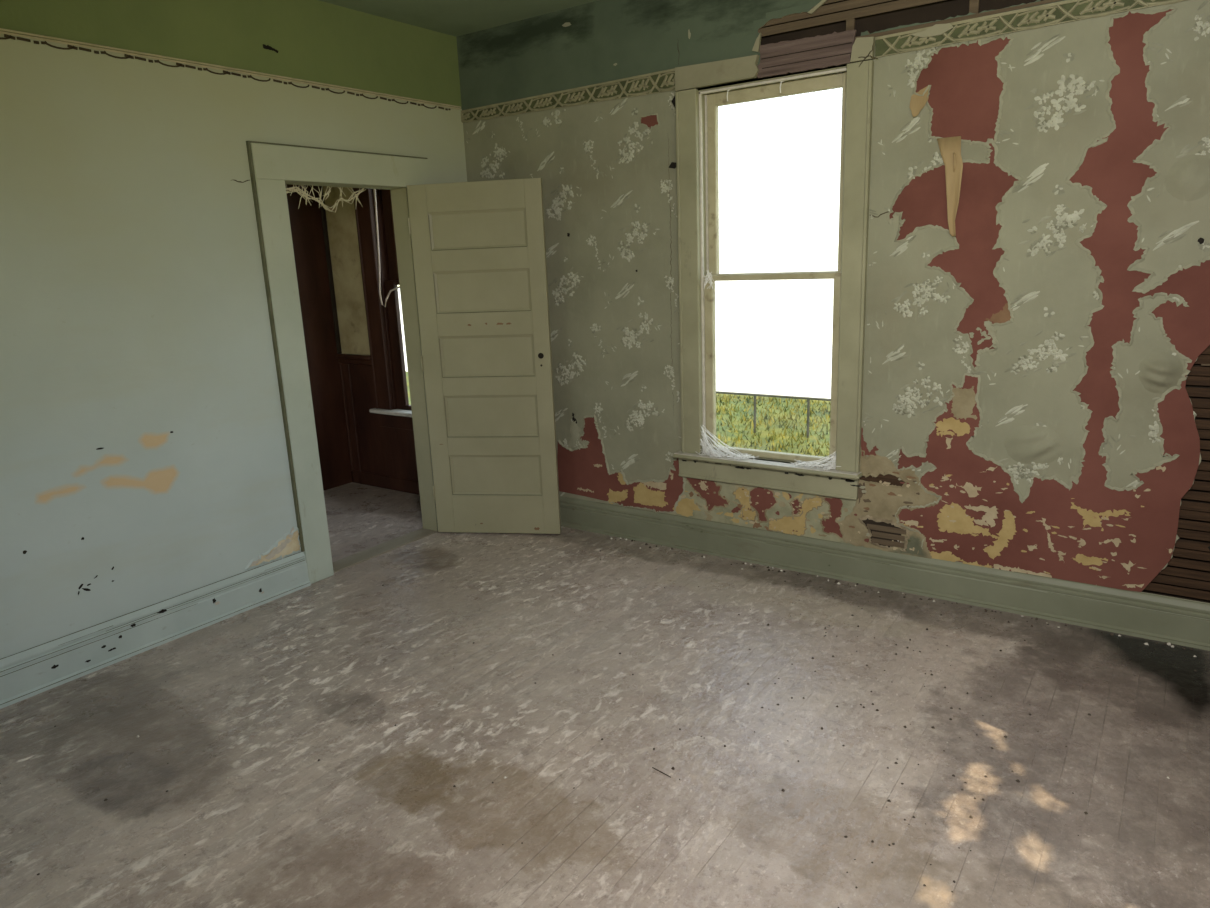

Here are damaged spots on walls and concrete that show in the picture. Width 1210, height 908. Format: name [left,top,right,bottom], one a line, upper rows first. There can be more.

flaking render [752,0,1062,52]
flaking render [557,9,1210,603]
peeling [96,429,183,499]
peeling [245,526,301,570]